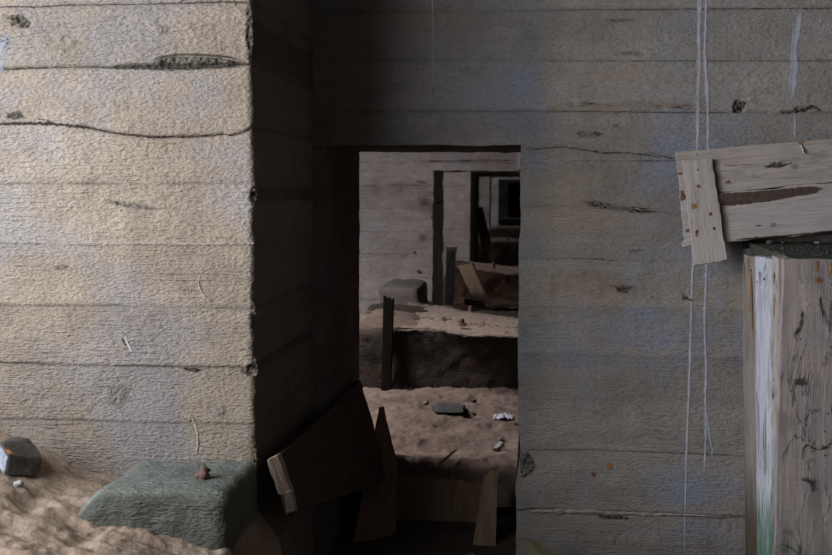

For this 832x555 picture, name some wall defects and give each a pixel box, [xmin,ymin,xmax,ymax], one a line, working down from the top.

crack [0,119,249,140]
spalling [106,4,253,71]
water stain [628,0,709,150]
water stain [789,13,801,97]
water stain [684,258,694,554]
water stain [703,264,721,469]